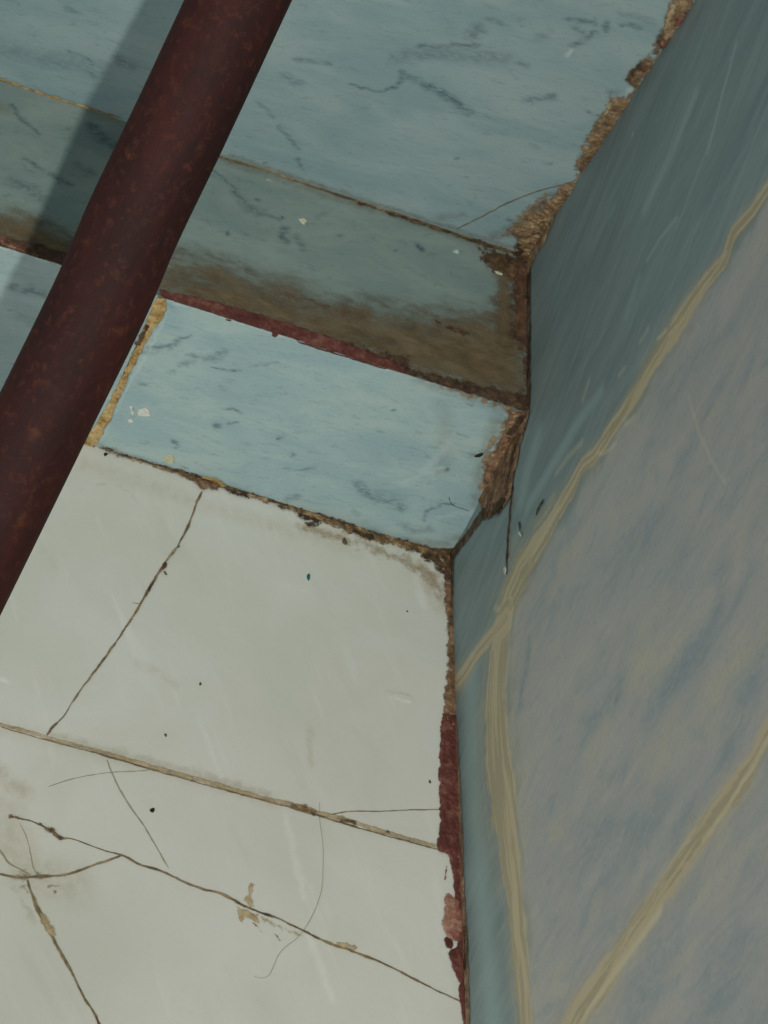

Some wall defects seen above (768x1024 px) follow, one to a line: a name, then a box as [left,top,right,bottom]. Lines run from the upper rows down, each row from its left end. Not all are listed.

spalling [569,0,694,187]
leakage [159,265,526,407]
crack [0,491,460,1024]
peeling [437,685,470,1024]